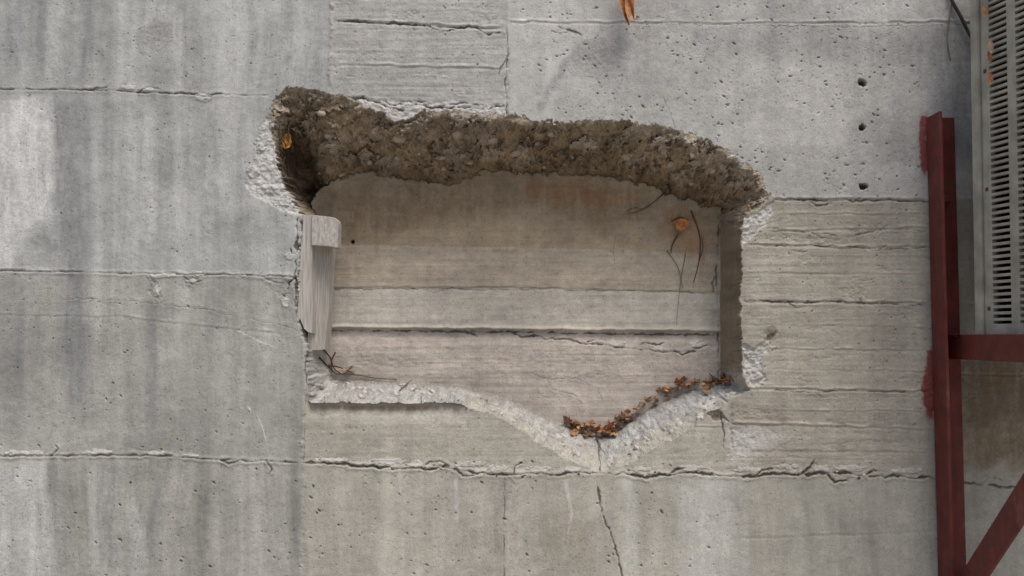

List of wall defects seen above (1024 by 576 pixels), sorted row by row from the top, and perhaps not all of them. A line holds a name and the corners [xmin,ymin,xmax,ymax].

crack [333,19,509,118]
spalling [243,86,775,247]
spalling [259,271,297,310]
corrosion [656,202,717,284]
crack [0,190,936,576]
spalling [308,323,795,472]